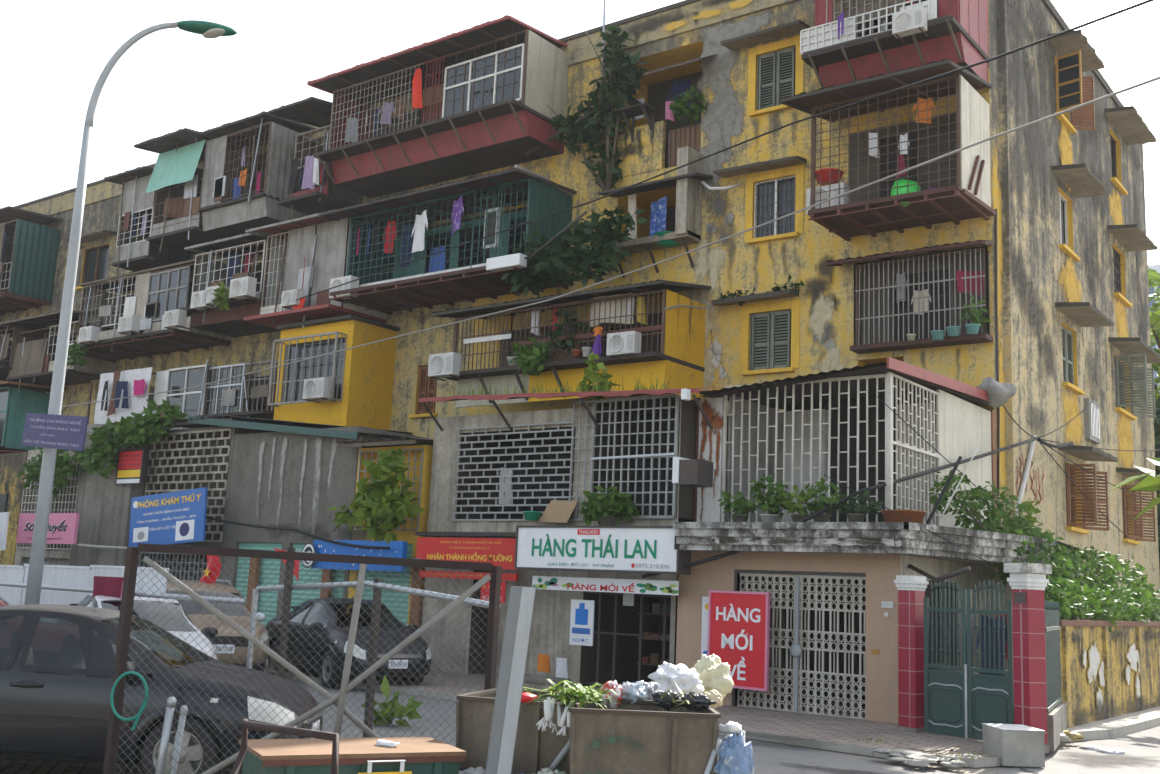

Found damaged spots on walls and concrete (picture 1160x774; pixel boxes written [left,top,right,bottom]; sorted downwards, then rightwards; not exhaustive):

leakage [1006,0,1047,216]
peeling [664,0,773,391]
peeling [809,293,848,372]
leakage [1011,250,1055,374]
leakage [1087,239,1101,309]
leakage [256,437,289,535]
leakage [299,438,337,516]
corrosion [700,400,723,520]
leakage [340,526,368,540]
peeling [1082,639,1106,708]
peeling [1124,643,1141,700]